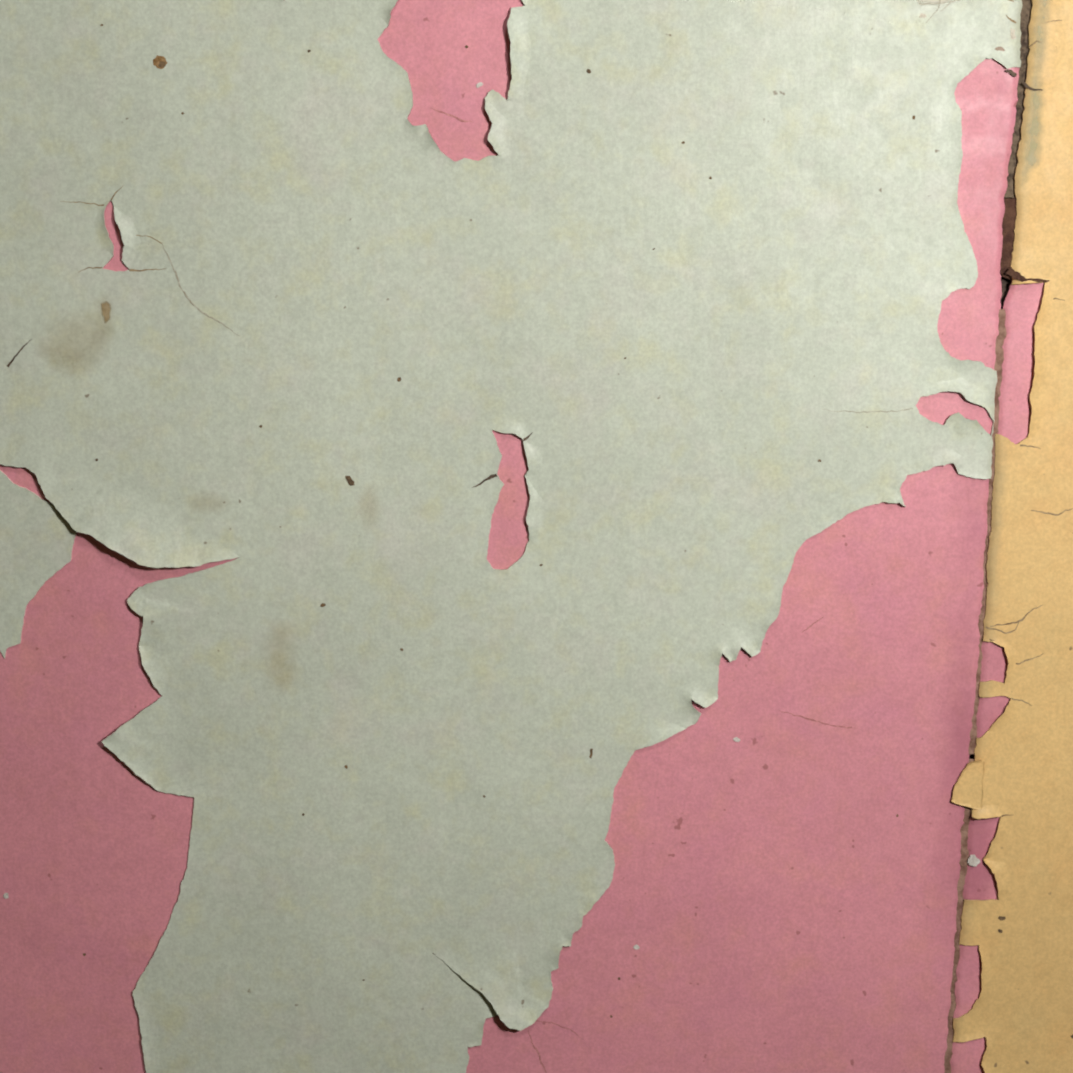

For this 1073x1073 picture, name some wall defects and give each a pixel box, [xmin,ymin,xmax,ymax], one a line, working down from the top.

peeling [377,0,532,161]
crack [60,186,123,206]
crack [7,339,32,367]
crack [129,235,239,336]
peeling [434,44,1059,1073]
peeling [0,390,239,1073]